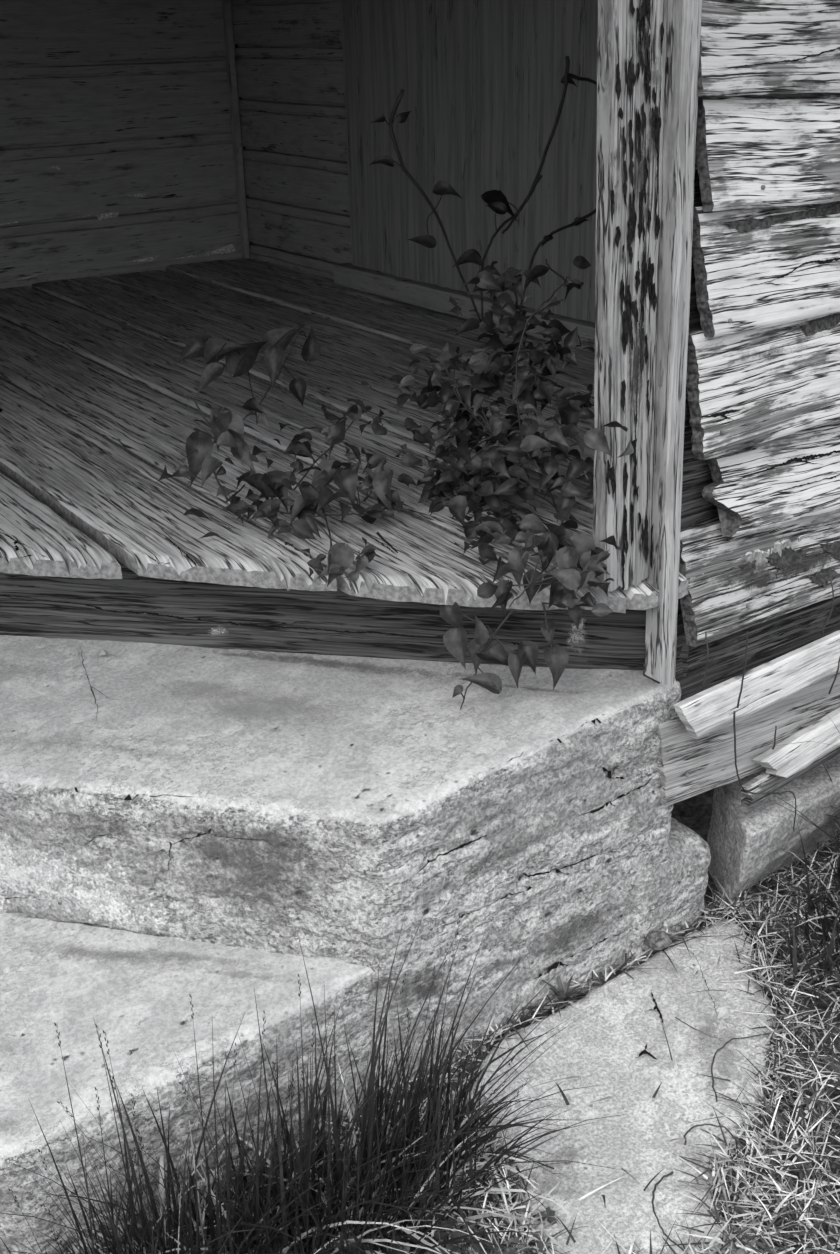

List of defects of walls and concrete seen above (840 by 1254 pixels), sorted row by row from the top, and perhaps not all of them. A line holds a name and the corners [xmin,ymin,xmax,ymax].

peeling [610,0,669,436]
crack [713,258,840,290]
peeling [605,440,653,590]
peeling [739,541,840,587]